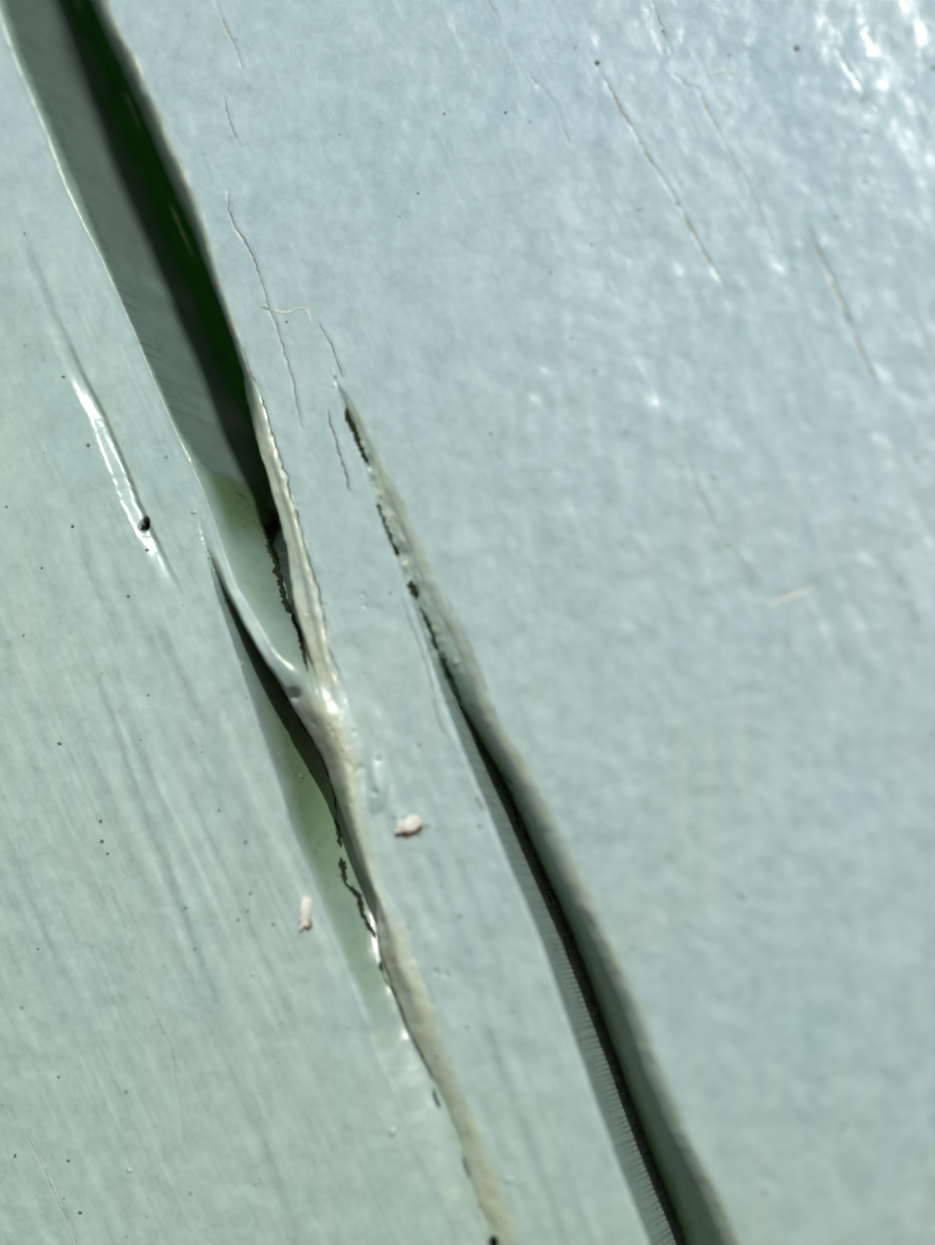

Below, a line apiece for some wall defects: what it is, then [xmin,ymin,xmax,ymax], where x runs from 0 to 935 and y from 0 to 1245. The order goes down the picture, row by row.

crack [0,0,741,1245]